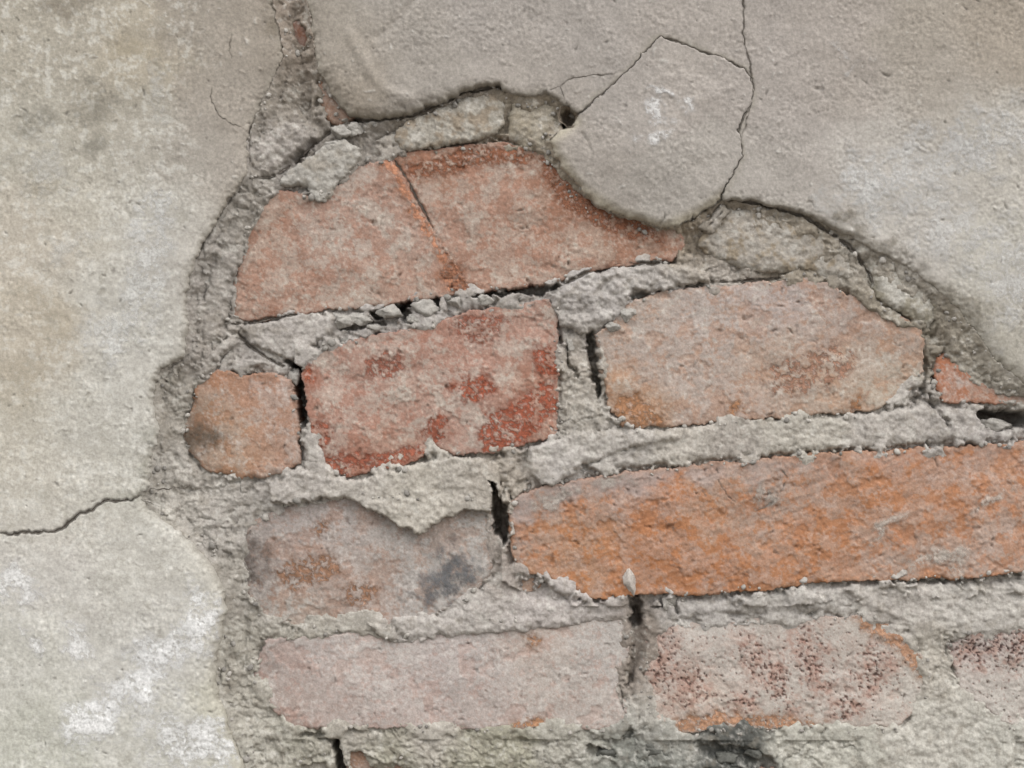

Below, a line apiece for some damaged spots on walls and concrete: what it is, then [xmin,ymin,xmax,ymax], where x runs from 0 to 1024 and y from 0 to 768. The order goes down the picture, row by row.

spalling [273,0,341,127]
crack [647,0,875,287]
crack [1,484,190,535]
spalling [143,78,1024,768]